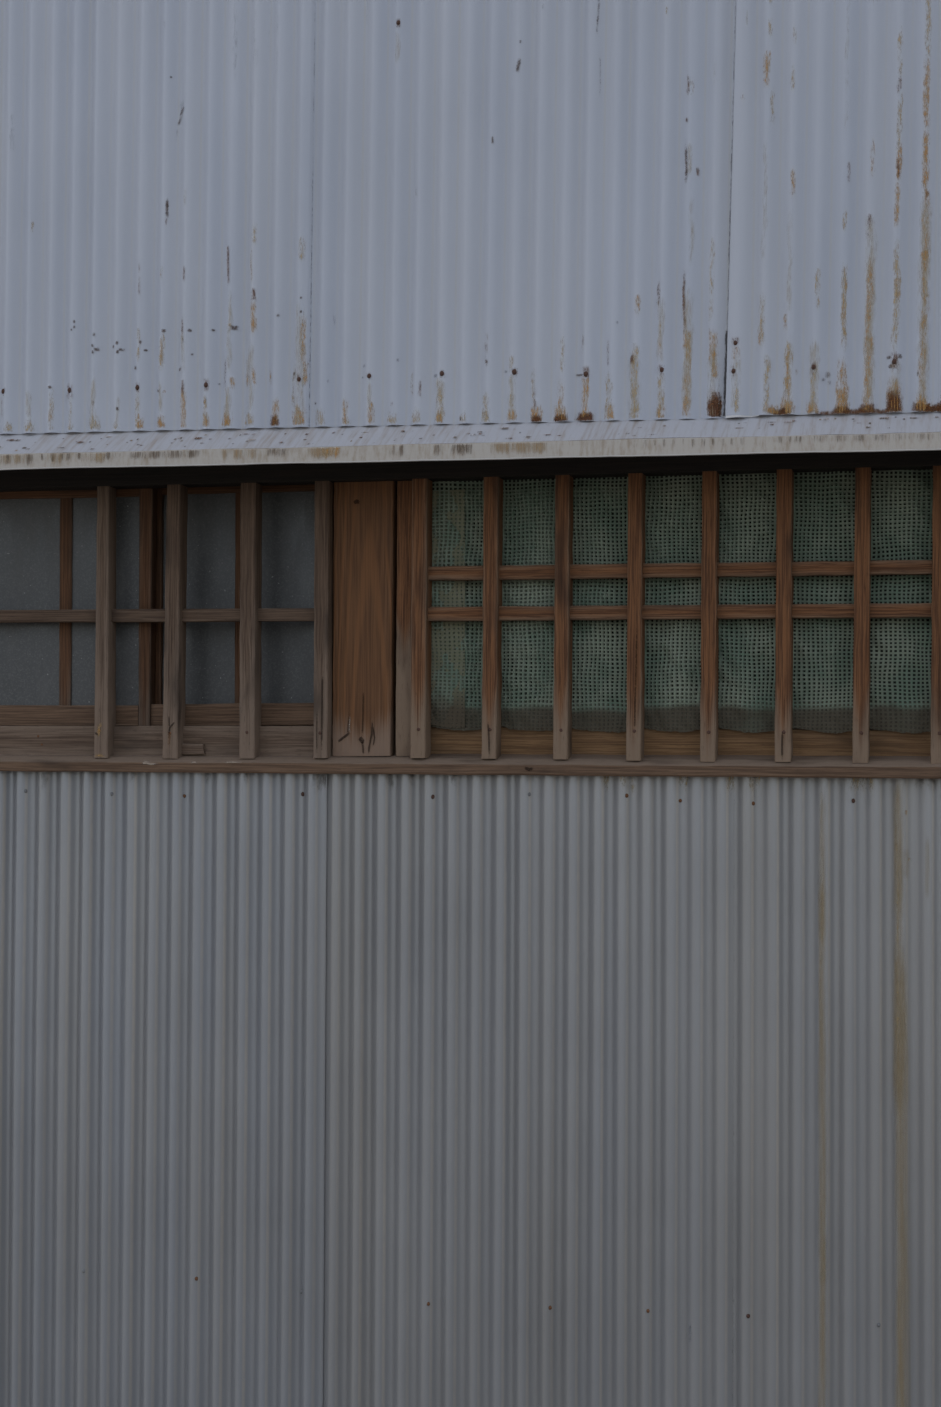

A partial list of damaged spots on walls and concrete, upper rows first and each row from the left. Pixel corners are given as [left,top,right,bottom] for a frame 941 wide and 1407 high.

corrosion [763,0,941,415]
corrosion [509,367,613,422]
leakage [5,452,110,464]
leakage [311,447,340,458]
leakage [494,443,545,452]